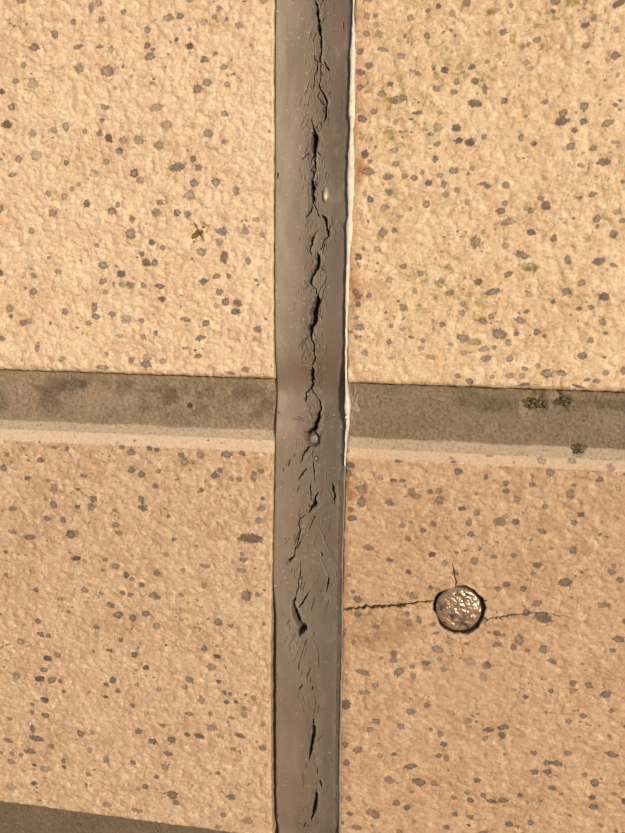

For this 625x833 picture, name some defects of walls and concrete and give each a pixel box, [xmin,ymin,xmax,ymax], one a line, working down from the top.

crack [275,0,433,833]